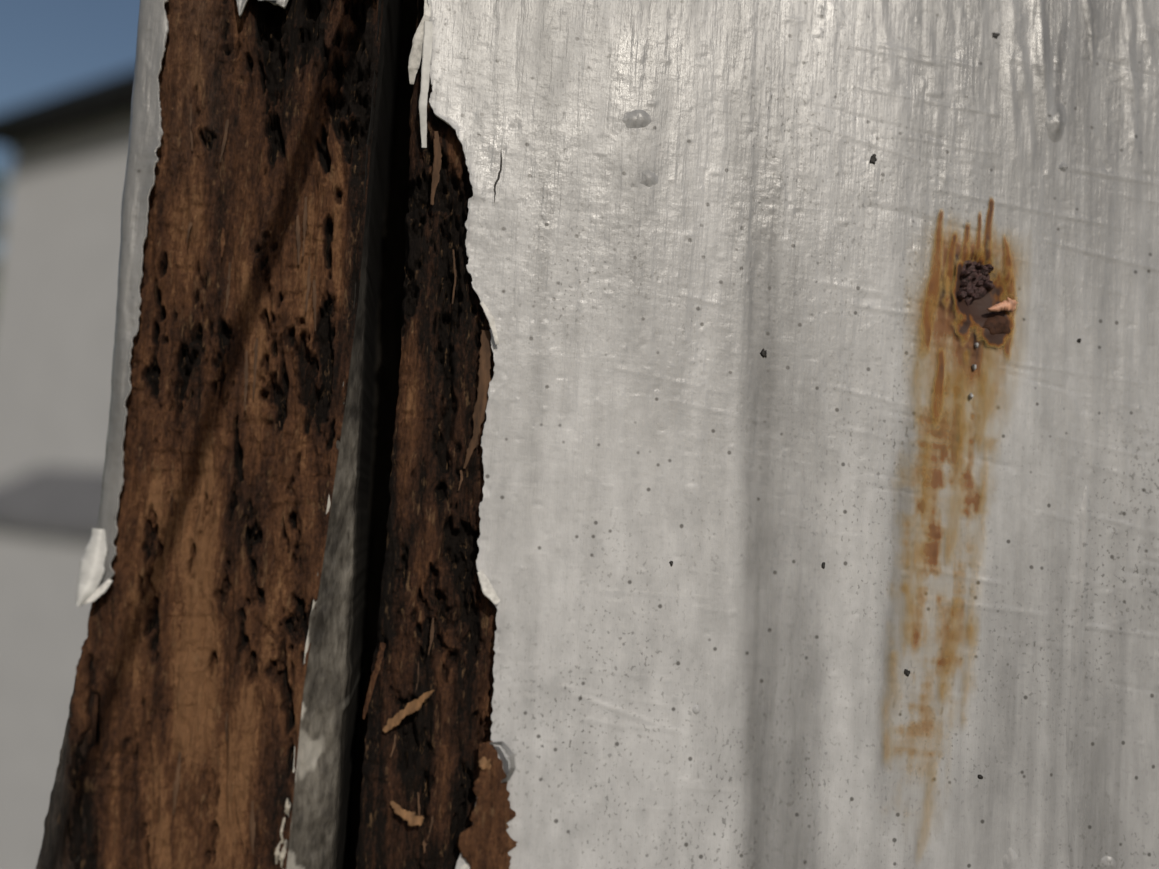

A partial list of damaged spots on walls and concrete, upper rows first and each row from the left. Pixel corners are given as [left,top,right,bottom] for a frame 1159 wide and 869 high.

peeling [408,0,433,148]
crack [346,0,418,869]
peeling [480,302,499,345]
rust [907,198,1016,574]
peeling [75,528,113,606]
peeling [477,570,500,605]
rust [903,586,971,673]
peeling [458,741,517,869]